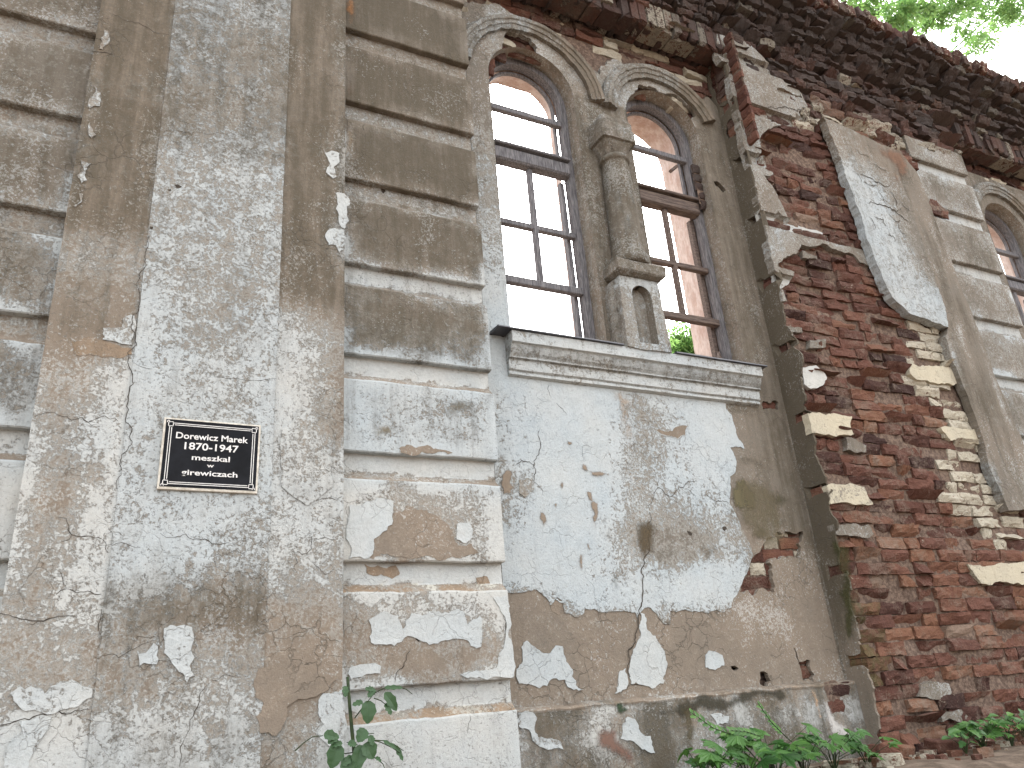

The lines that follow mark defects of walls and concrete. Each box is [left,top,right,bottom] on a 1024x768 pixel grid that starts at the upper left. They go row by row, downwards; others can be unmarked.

crack [37,237,149,489]
flaking render [705,32,1024,754]
crack [60,517,138,553]
leakage [638,522,654,554]
leakage [733,480,784,541]
crack [0,573,153,658]
peeling [138,625,195,682]
peeling [369,609,482,648]
peeling [461,595,582,691]
crack [621,549,650,693]
peeling [616,613,668,693]
crack [1,709,85,726]